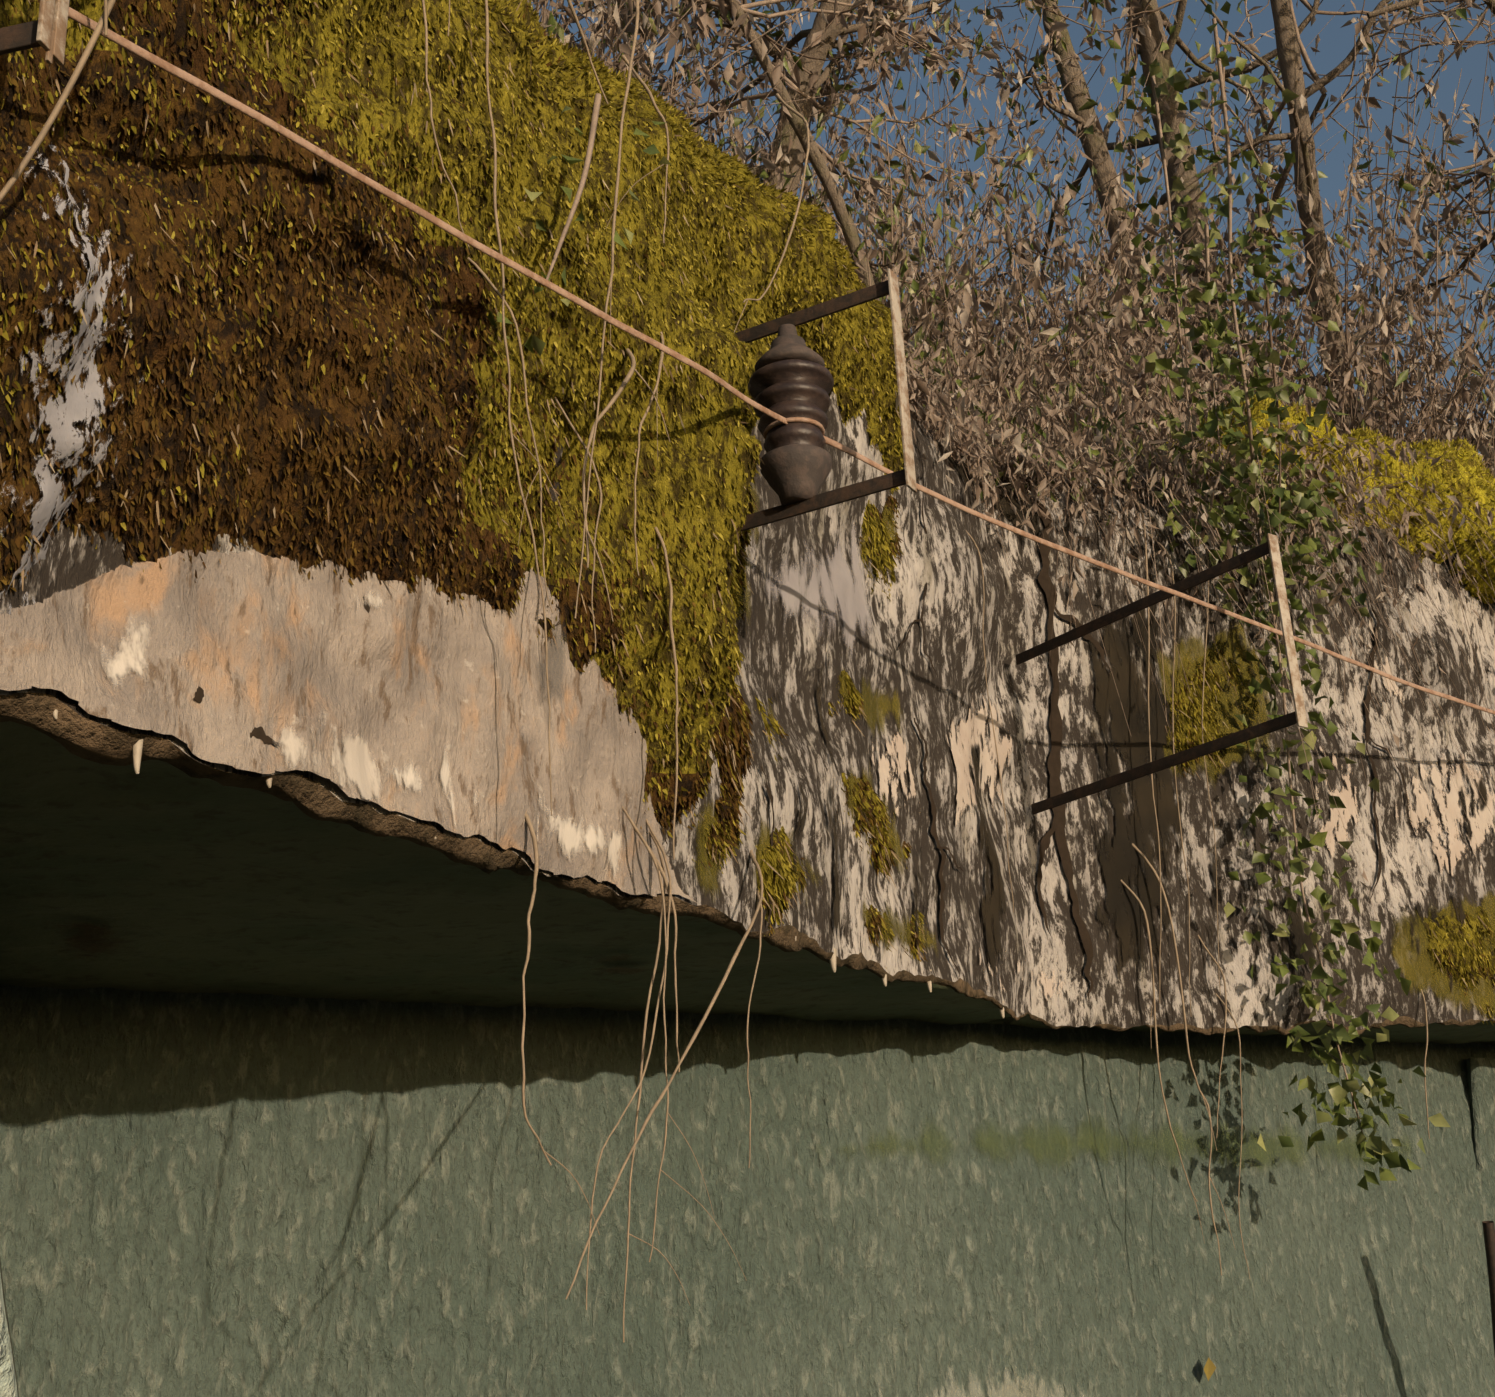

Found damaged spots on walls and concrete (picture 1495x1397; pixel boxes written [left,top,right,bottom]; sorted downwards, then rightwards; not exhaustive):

water stain [0,144,133,615]
spalling [0,549,701,904]
peeling [872,733,920,816]
peeling [946,697,1012,826]
peeling [1314,746,1361,857]
peeling [1395,753,1495,876]
peeling [979,951,1063,1001]